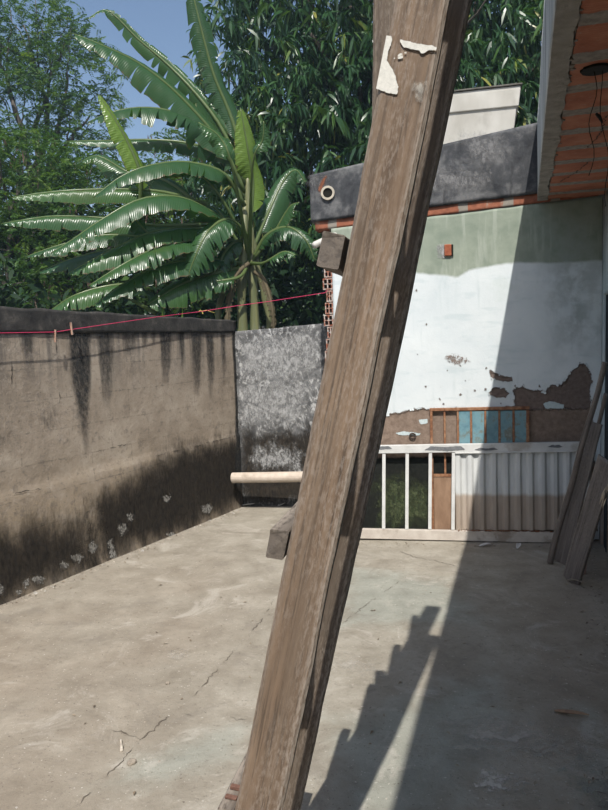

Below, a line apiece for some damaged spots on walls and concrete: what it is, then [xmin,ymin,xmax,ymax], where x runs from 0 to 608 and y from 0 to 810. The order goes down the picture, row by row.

leakage [0,331,317,605]
peeling [378,398,465,458]
peeling [469,362,593,448]
crack [81,650,245,802]